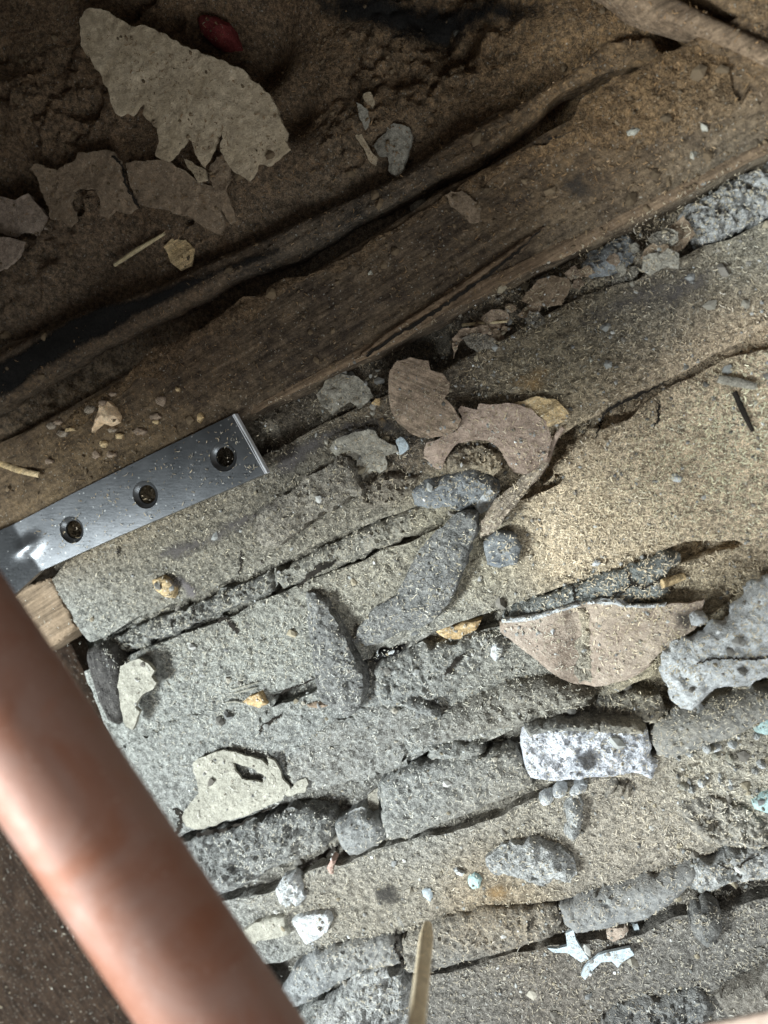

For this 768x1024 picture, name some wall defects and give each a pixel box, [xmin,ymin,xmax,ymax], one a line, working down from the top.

peeling [316,373,373,415]
crack [595,378,671,439]
peeling [329,429,410,479]
crack [297,559,336,588]
crack [444,653,466,676]
crack [696,656,768,664]
peeling [117,658,159,730]
crack [259,679,313,733]
peeling [182,749,309,829]
crack [173,805,276,838]
peeling [243,910,334,945]
peeling [547,921,639,979]